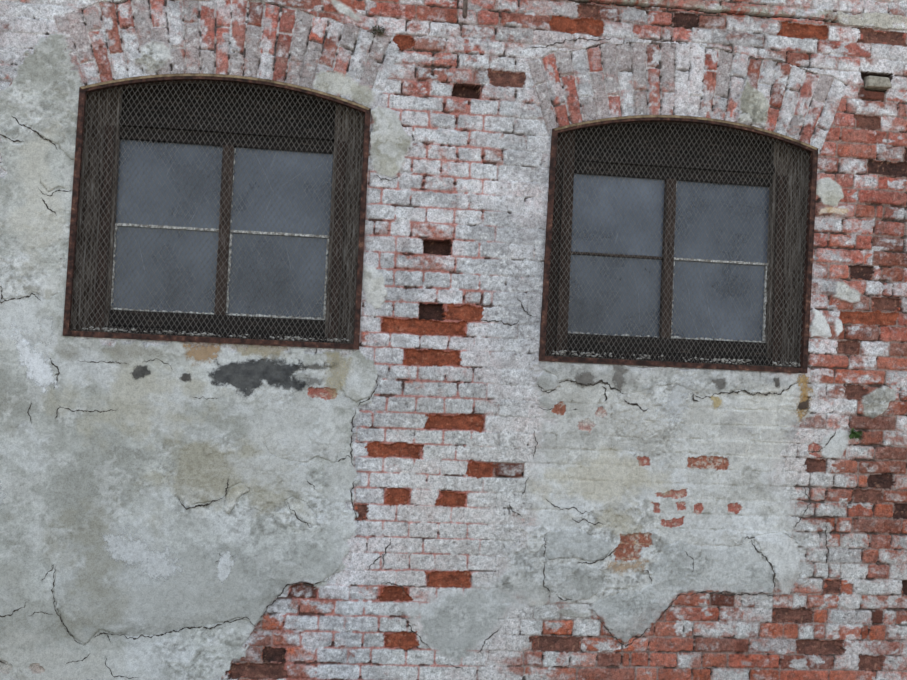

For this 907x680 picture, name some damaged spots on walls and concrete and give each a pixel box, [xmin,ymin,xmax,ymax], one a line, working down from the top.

crack [0,116,58,150]
flaking render [10,84,79,192]
crack [0,286,41,303]
crack [50,358,119,417]
spalling [424,413,486,432]
spalling [365,441,424,459]
spalling [435,490,467,507]
spalling [425,570,472,588]
crack [543,538,573,601]
crack [598,536,780,647]
crack [0,565,329,679]
spalling [384,631,420,650]